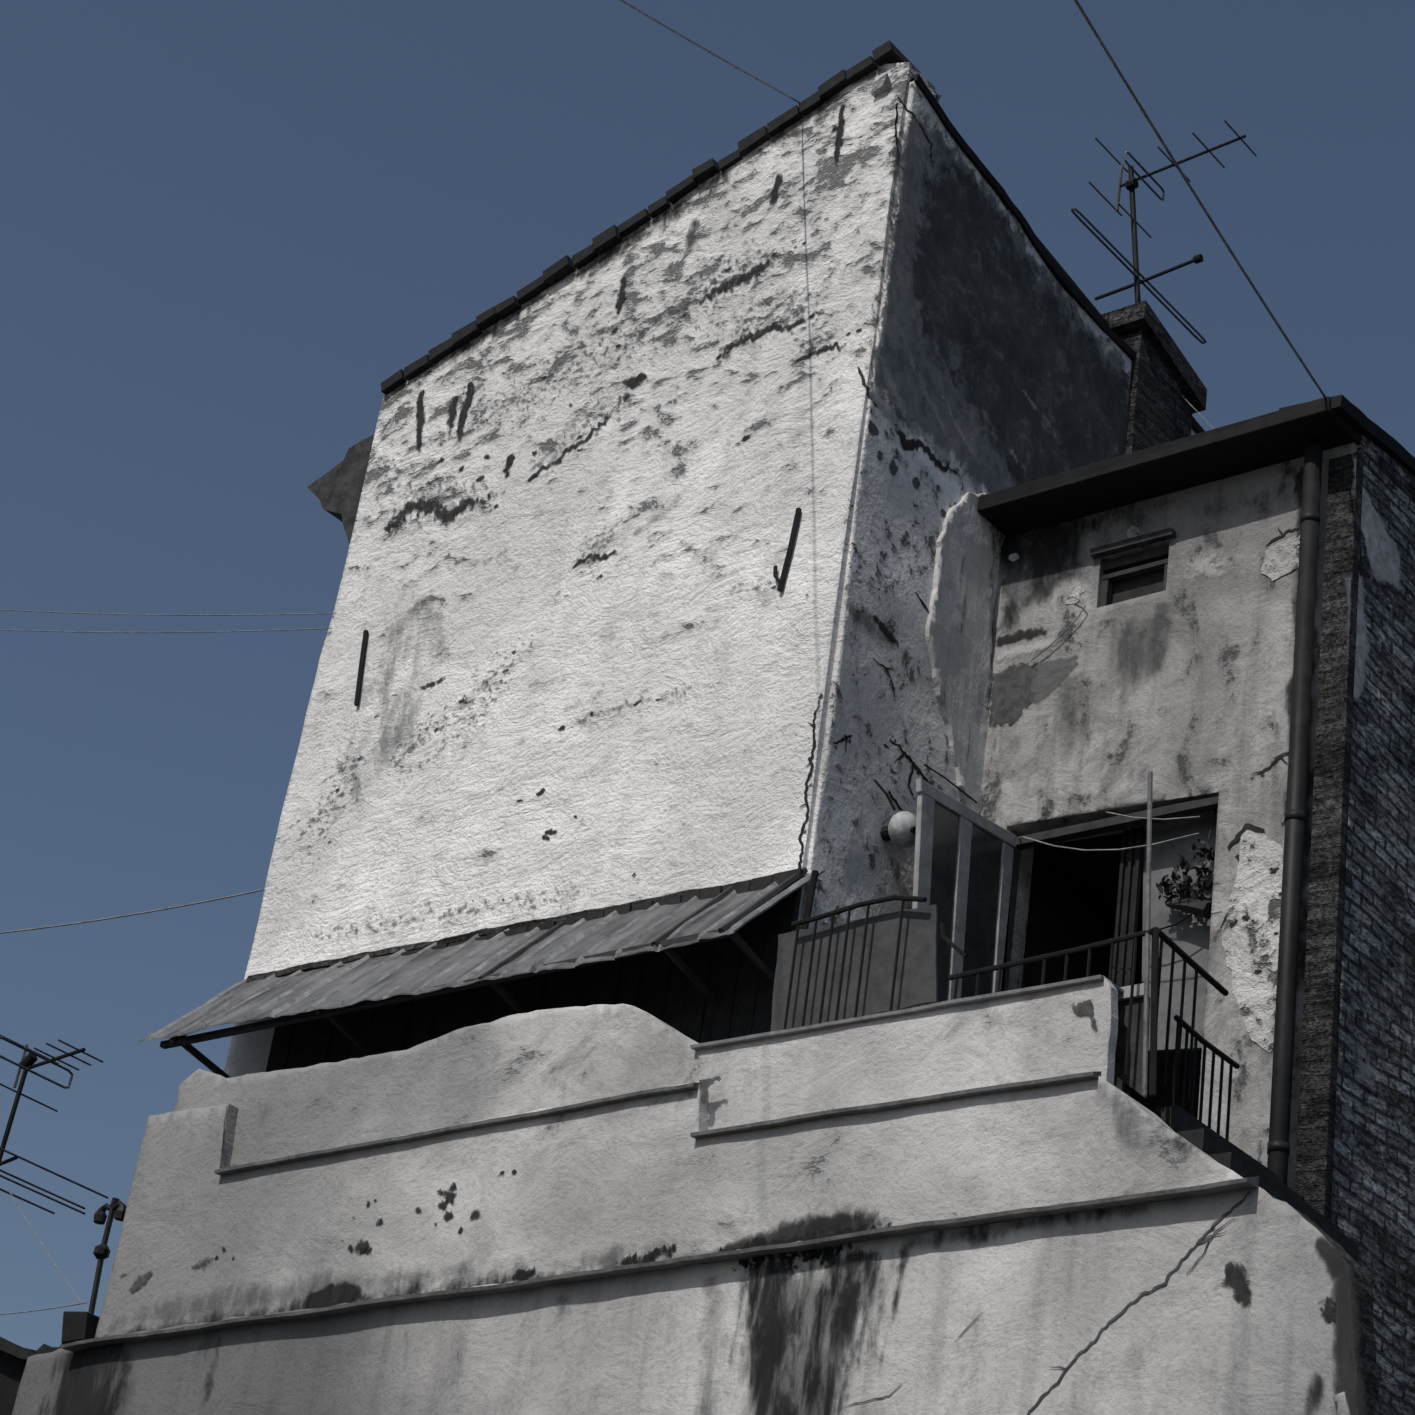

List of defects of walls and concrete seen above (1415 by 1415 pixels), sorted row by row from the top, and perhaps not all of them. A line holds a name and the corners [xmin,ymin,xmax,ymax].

peeling [384,112,1131,532]
peeling [573,519,622,579]
spalling [1261,535,1300,581]
crack [798,693,852,868]
crack [888,736,932,811]
spalling [1222,825,1284,1052]
leakage [40,1312,183,1415]
spalling [347,1239,372,1255]
leakage [396,1273,421,1296]
spalling [415,1182,480,1234]
leakage [718,1212,892,1415]
crack [1027,1192,1250,1415]